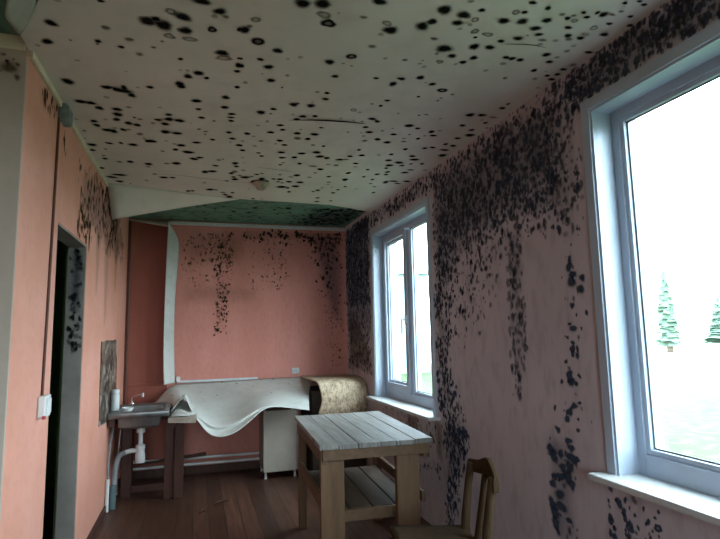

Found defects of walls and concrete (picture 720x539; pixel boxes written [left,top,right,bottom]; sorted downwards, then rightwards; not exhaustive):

damp [140,9,197,48]
damp [193,0,228,18]
damp [101,85,135,97]
damp [175,71,209,88]
damp [215,50,244,73]
damp [155,113,215,160]
damp [75,100,156,256]
damp [66,249,82,352]
peeling [108,183,239,385]
damp [184,232,234,336]
damp [226,0,720,539]